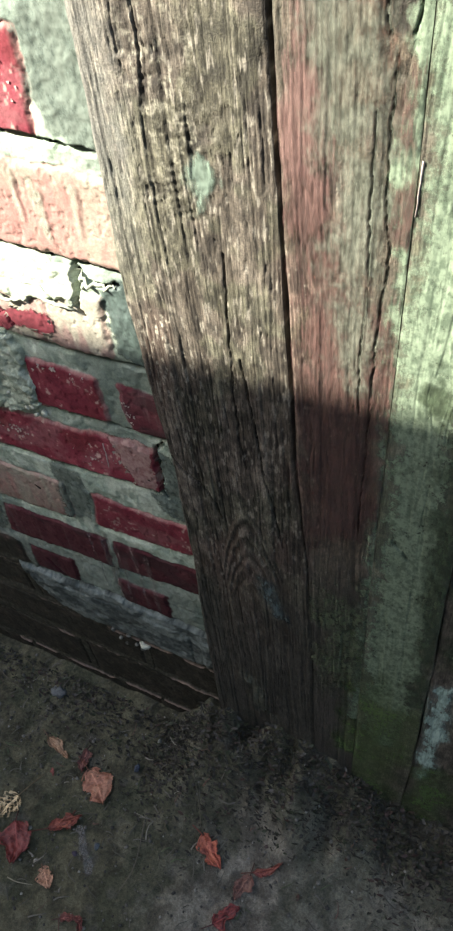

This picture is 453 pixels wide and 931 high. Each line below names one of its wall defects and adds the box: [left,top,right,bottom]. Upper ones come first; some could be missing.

peeling [0,305,54,337]